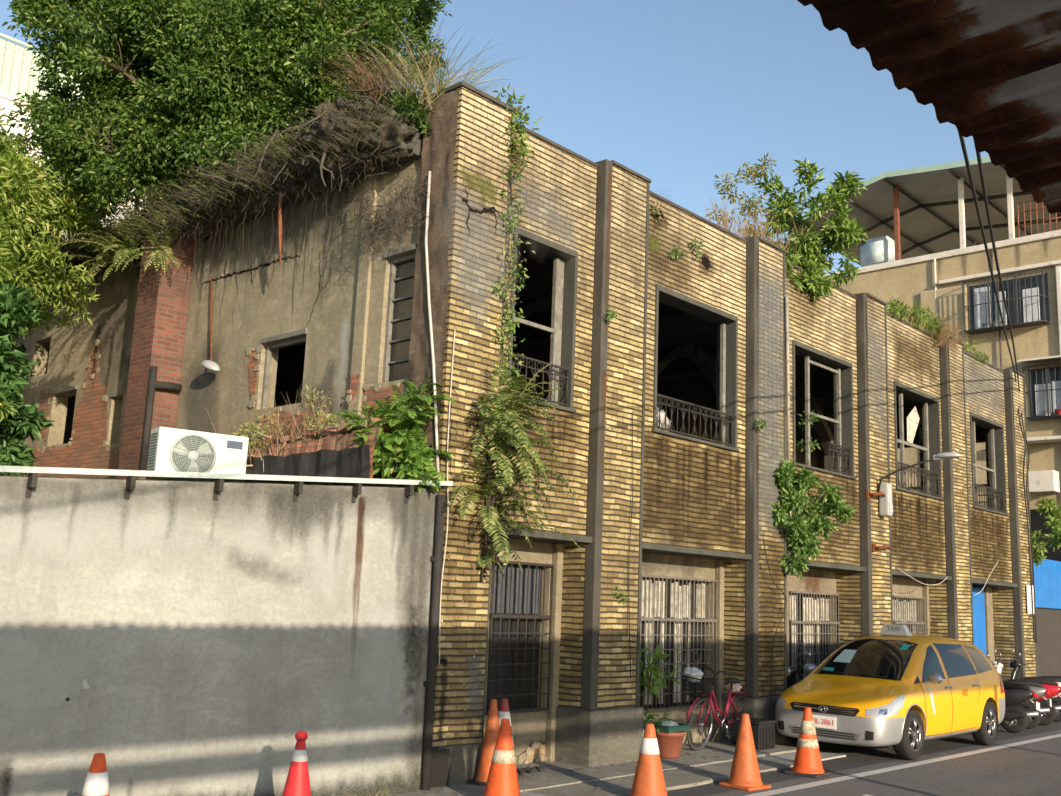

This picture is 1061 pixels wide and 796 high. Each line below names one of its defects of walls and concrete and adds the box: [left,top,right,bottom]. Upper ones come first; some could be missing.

rust [797,0,1061,214]
crack [458,187,500,238]
crack [203,245,330,328]
flaking render [246,89,495,488]
flaking render [24,339,119,479]
water stain [0,517,195,560]
rust [355,499,365,595]